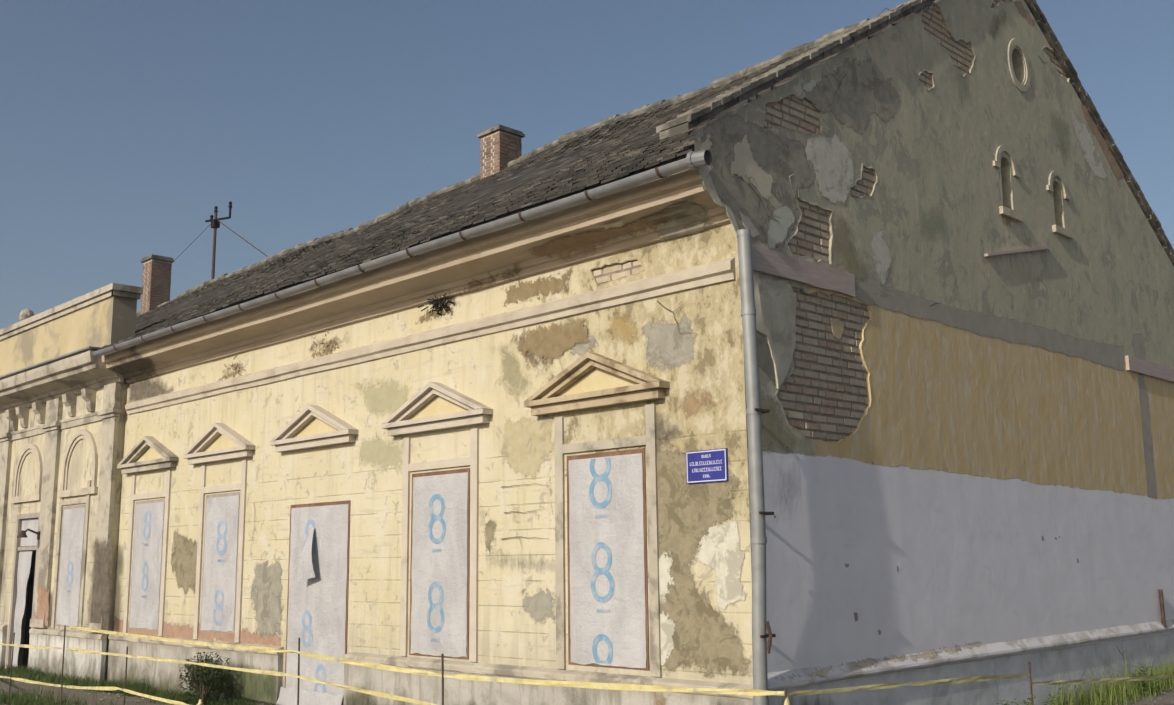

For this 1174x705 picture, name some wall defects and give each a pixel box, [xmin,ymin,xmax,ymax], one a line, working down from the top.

flaking render [908,2,976,78]
peeling [640,58,901,266]
flaking render [590,257,645,287]
flaking render [757,285,872,446]
peeling [171,529,197,594]
peeling [250,561,282,636]
peeling [522,589,556,622]
peeling [647,448,750,677]